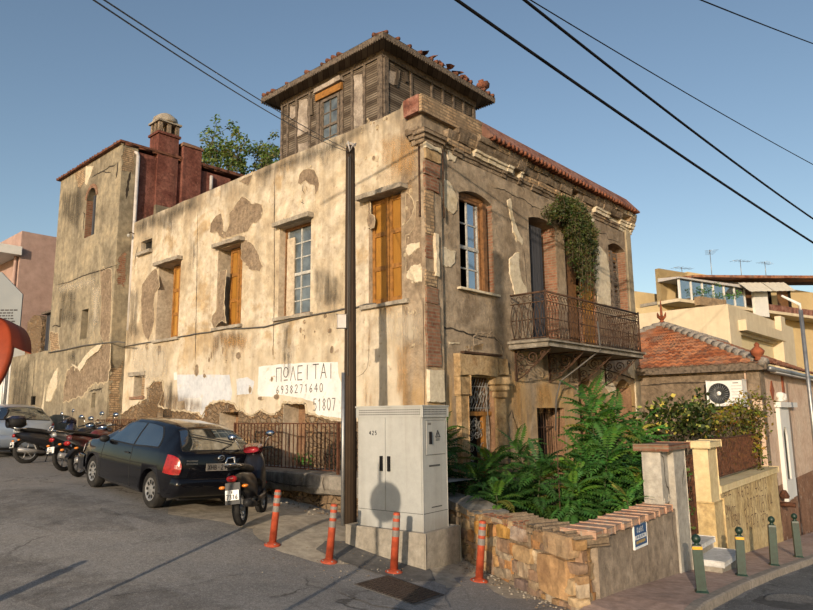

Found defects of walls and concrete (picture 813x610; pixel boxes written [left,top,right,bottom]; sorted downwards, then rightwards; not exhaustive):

crack [93,163,131,199]
peeling [298,165,320,195]
peeling [441,179,458,214]
peeling [210,196,263,275]
peeling [406,242,422,283]
peeling [507,199,527,294]
peeling [141,269,162,356]
peeling [42,252,127,433]
crack [444,327,500,343]